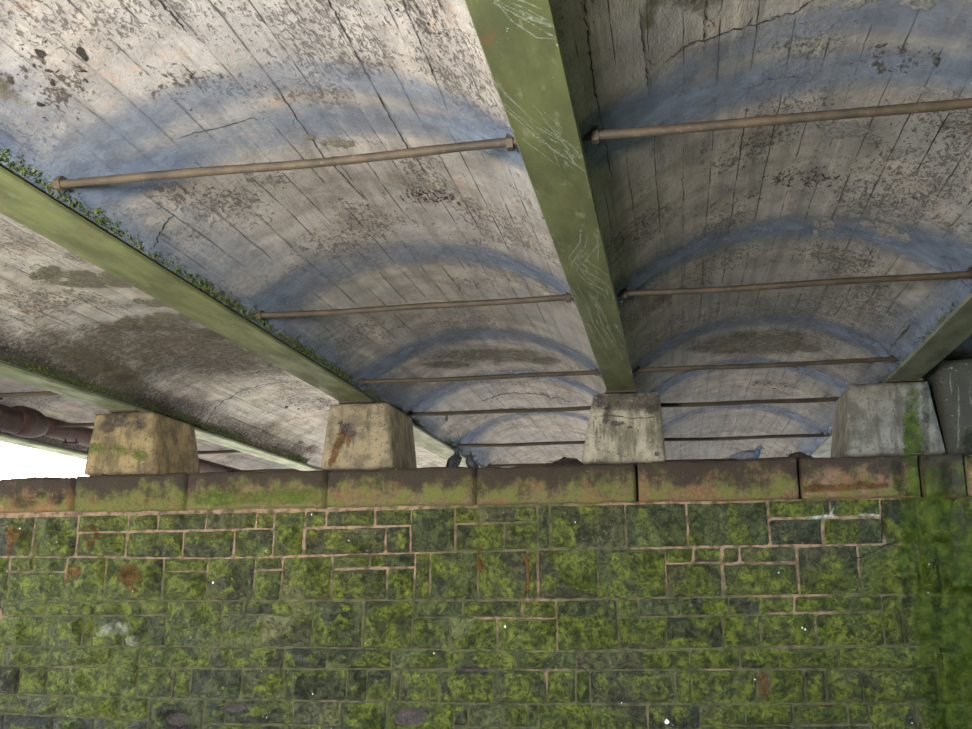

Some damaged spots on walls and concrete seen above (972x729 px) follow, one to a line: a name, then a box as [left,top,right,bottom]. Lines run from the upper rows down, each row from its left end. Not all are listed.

crack [639,0,813,94]
leakage [393,81,525,167]
leakage [0,96,217,293]
leakage [399,248,574,302]
leakage [88,319,227,339]
leakage [223,269,705,423]
leakage [0,327,306,460]
corrosion [328,430,351,466]
leakage [385,381,464,433]
leakage [444,412,589,466]
leakage [663,404,832,456]
leakage [897,411,972,729]